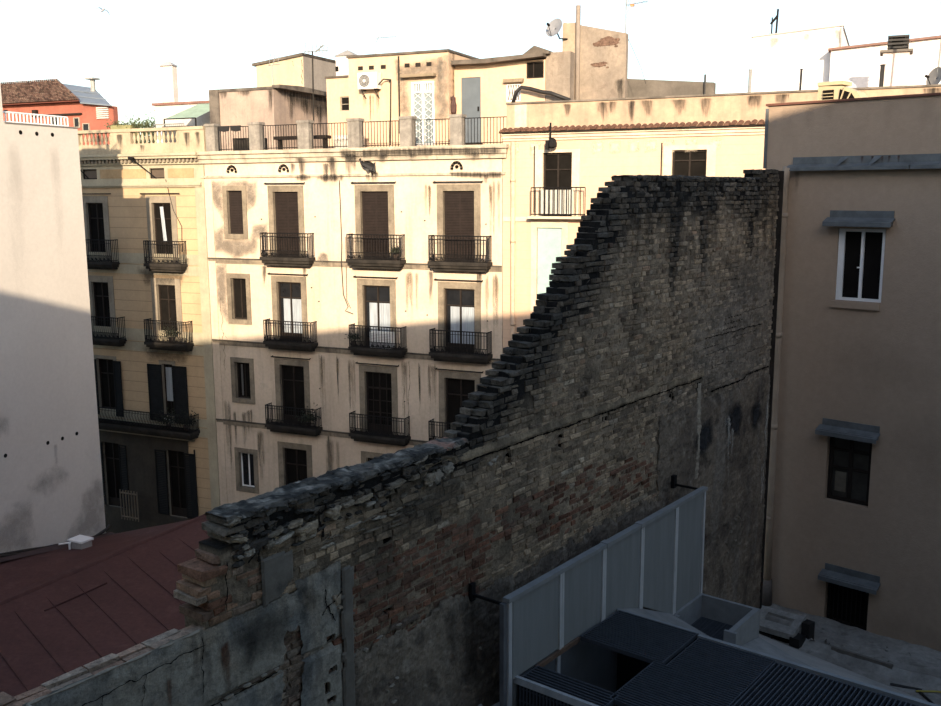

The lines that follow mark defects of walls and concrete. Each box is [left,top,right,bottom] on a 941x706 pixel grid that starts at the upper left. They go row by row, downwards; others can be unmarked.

spalling [593,36,620,47]
water stain [321,147,496,180]
crack [433,304,769,473]
crack [82,638,277,706]
flaking render [221,625,311,706]